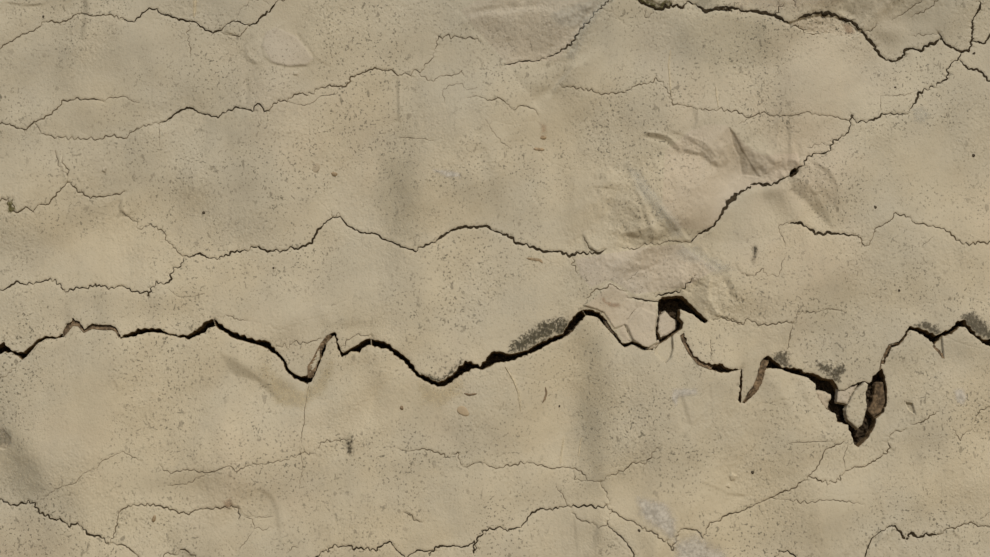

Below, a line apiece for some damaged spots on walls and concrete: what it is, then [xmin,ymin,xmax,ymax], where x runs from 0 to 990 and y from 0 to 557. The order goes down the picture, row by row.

crack [0,0,990,297]
crack [0,271,695,556]
flaking render [575,244,716,350]
crack [680,308,836,404]
spalling [807,368,888,448]
crack [879,319,990,370]
crack [291,406,989,557]